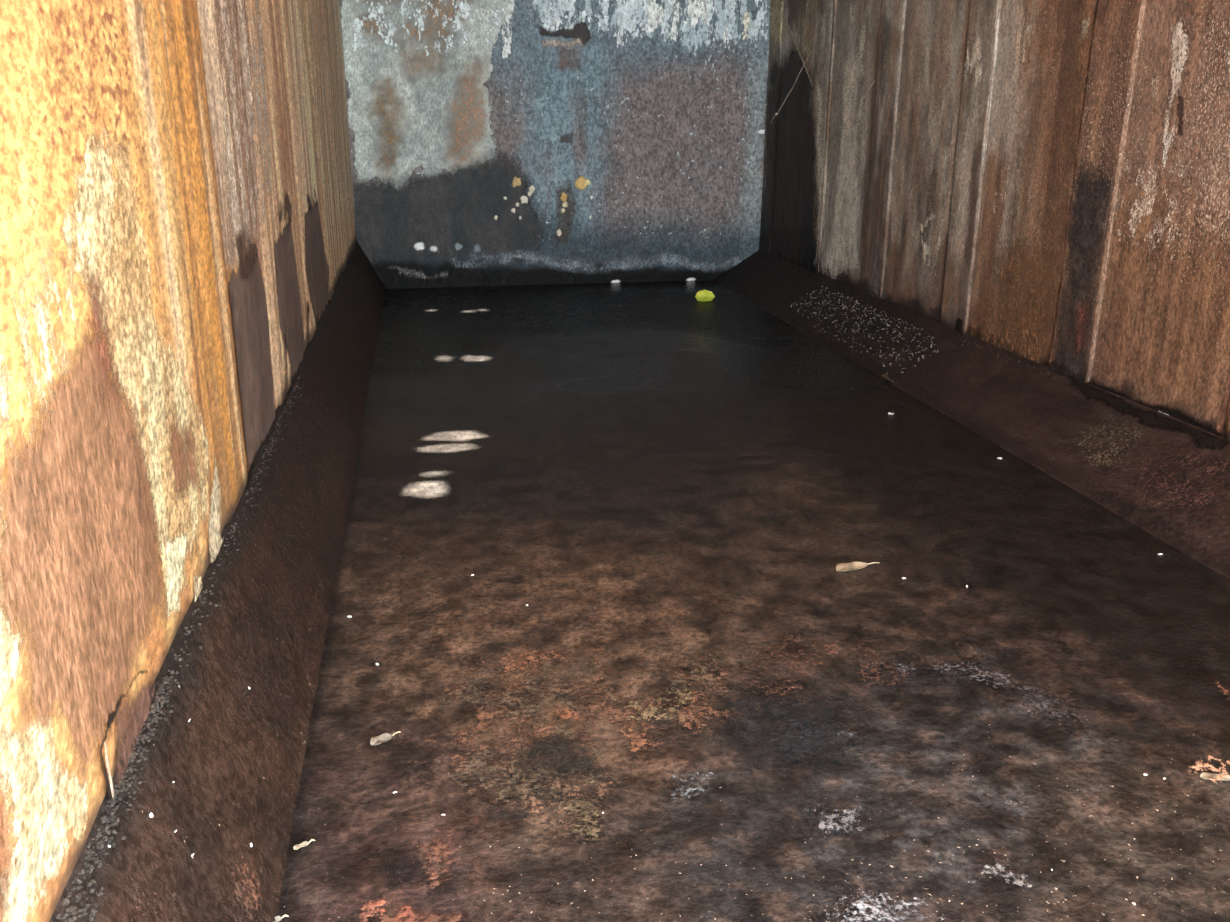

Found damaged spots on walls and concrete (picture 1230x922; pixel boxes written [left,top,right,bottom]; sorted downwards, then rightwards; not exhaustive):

spalling [538,21,591,69]
peeling [340,0,515,189]
damp [759,0,951,304]
damp [1103,157,1187,258]
rust [171,425,197,492]
rust [0,282,165,778]
rust [412,632,912,843]
damp [805,804,864,833]
rust [359,898,464,922]
rust [421,829,455,890]
damp [826,876,944,922]
damp [967,864,1032,891]